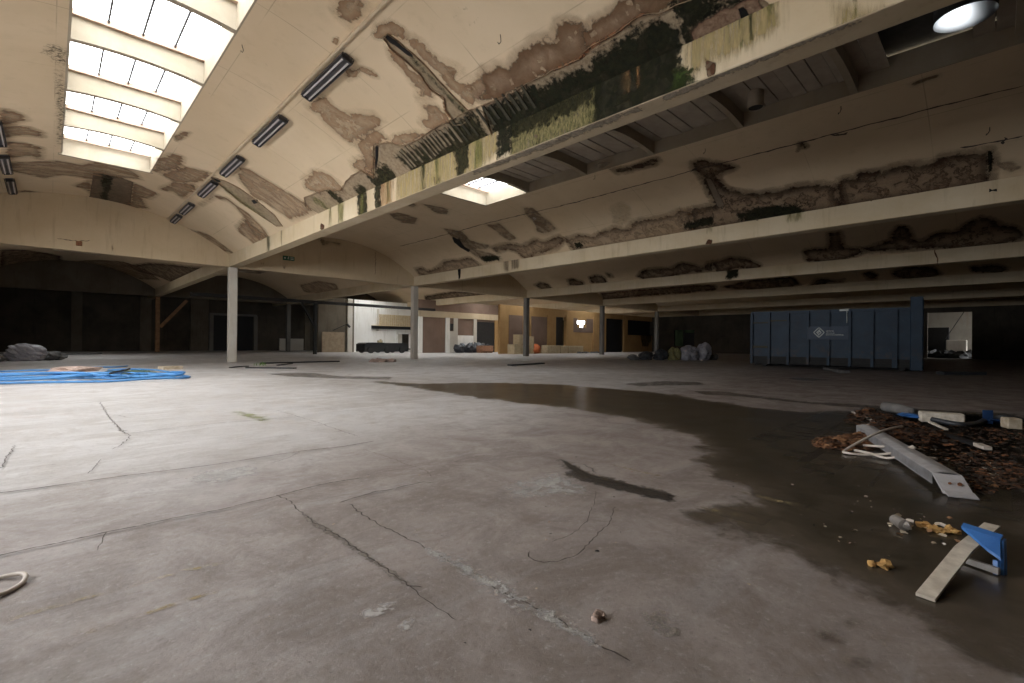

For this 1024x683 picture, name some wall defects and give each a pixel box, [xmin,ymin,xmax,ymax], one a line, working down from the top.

water stain [310,0,685,176]
spalling [304,0,770,230]
water stain [391,203,448,224]
water stain [630,381,881,409]
crack [277,495,456,620]
crack [351,504,630,661]
crack [528,459,679,563]